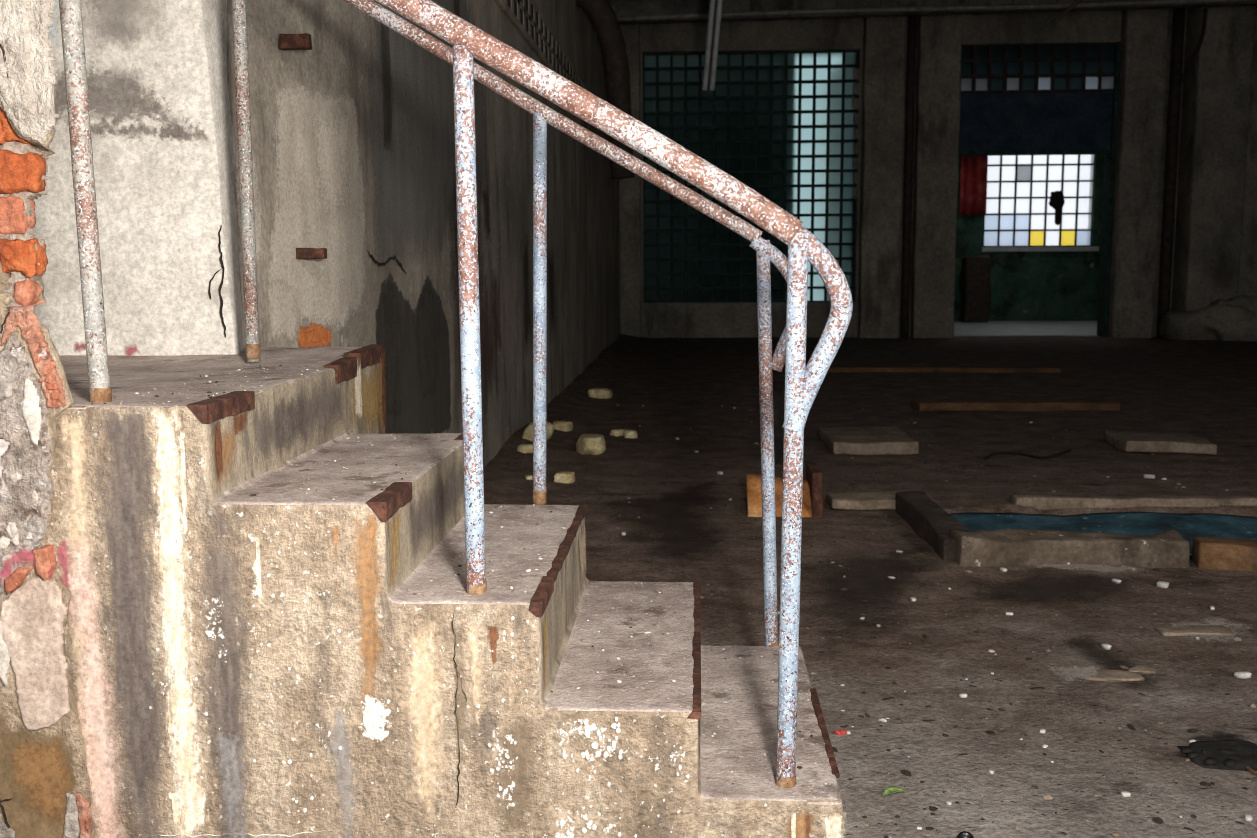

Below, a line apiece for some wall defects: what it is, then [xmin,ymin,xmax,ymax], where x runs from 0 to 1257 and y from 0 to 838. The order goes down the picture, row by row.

damp [54,73,69,125]
damp [87,71,207,140]
crack [208,225,226,337]
crack [367,250,407,274]
peeling [0,300,70,731]
damp [0,409,263,838]
rust [354,515,400,701]